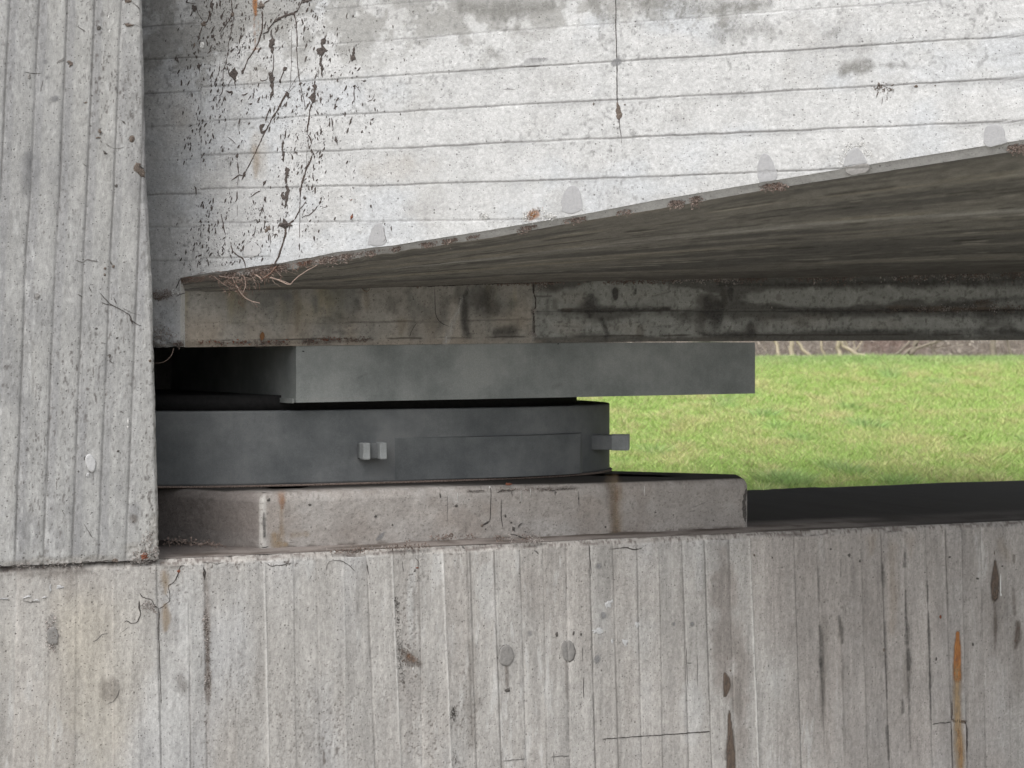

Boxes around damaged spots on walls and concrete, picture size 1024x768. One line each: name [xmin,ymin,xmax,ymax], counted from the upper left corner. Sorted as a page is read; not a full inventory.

crack [614,0,622,143]
water stain [991,552,1002,601]
rust [951,631,966,768]